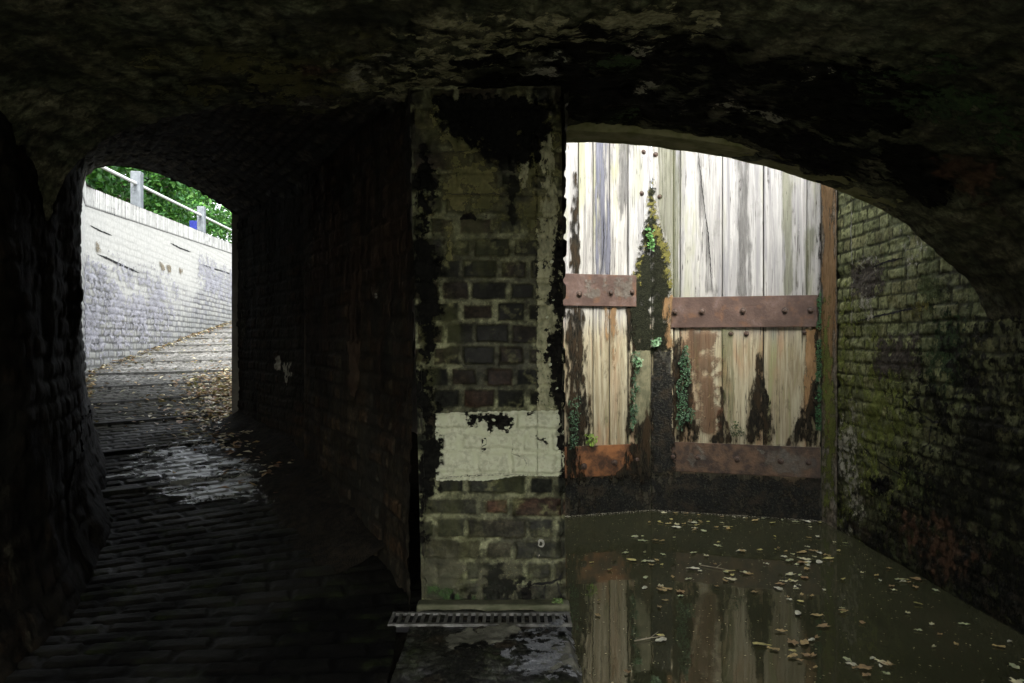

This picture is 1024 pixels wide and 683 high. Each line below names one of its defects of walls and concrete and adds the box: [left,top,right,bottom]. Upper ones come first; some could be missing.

peeling [435,134,565,481]
water stain [305,0,960,296]
water stain [564,142,821,521]
water stain [837,274,1024,635]